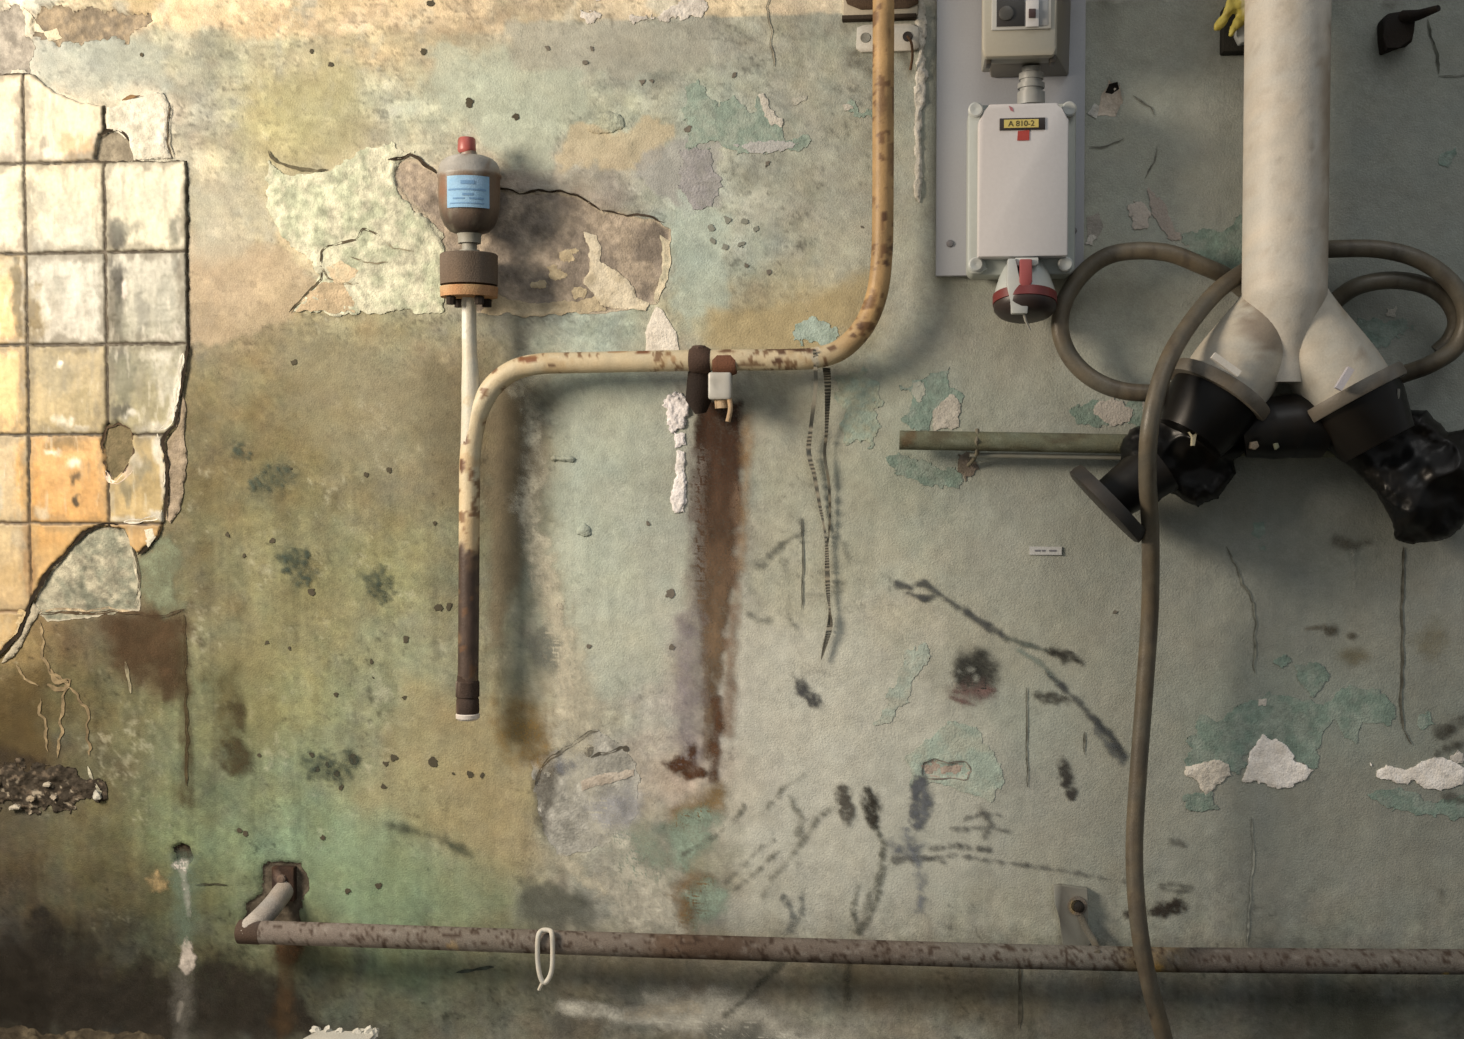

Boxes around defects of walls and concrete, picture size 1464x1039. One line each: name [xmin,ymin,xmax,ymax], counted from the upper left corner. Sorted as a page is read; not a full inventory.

spalling [0,4,153,75]
peeling [97,92,172,162]
crack [388,153,437,174]
crack [1427,19,1464,77]
spalling [265,141,679,351]
spalling [36,343,188,622]
leakage [109,613,250,775]
rust [667,401,749,823]
crack [1399,547,1412,744]
leakage [0,859,314,1039]
rust [670,875,711,924]
leakage [558,988,824,1039]